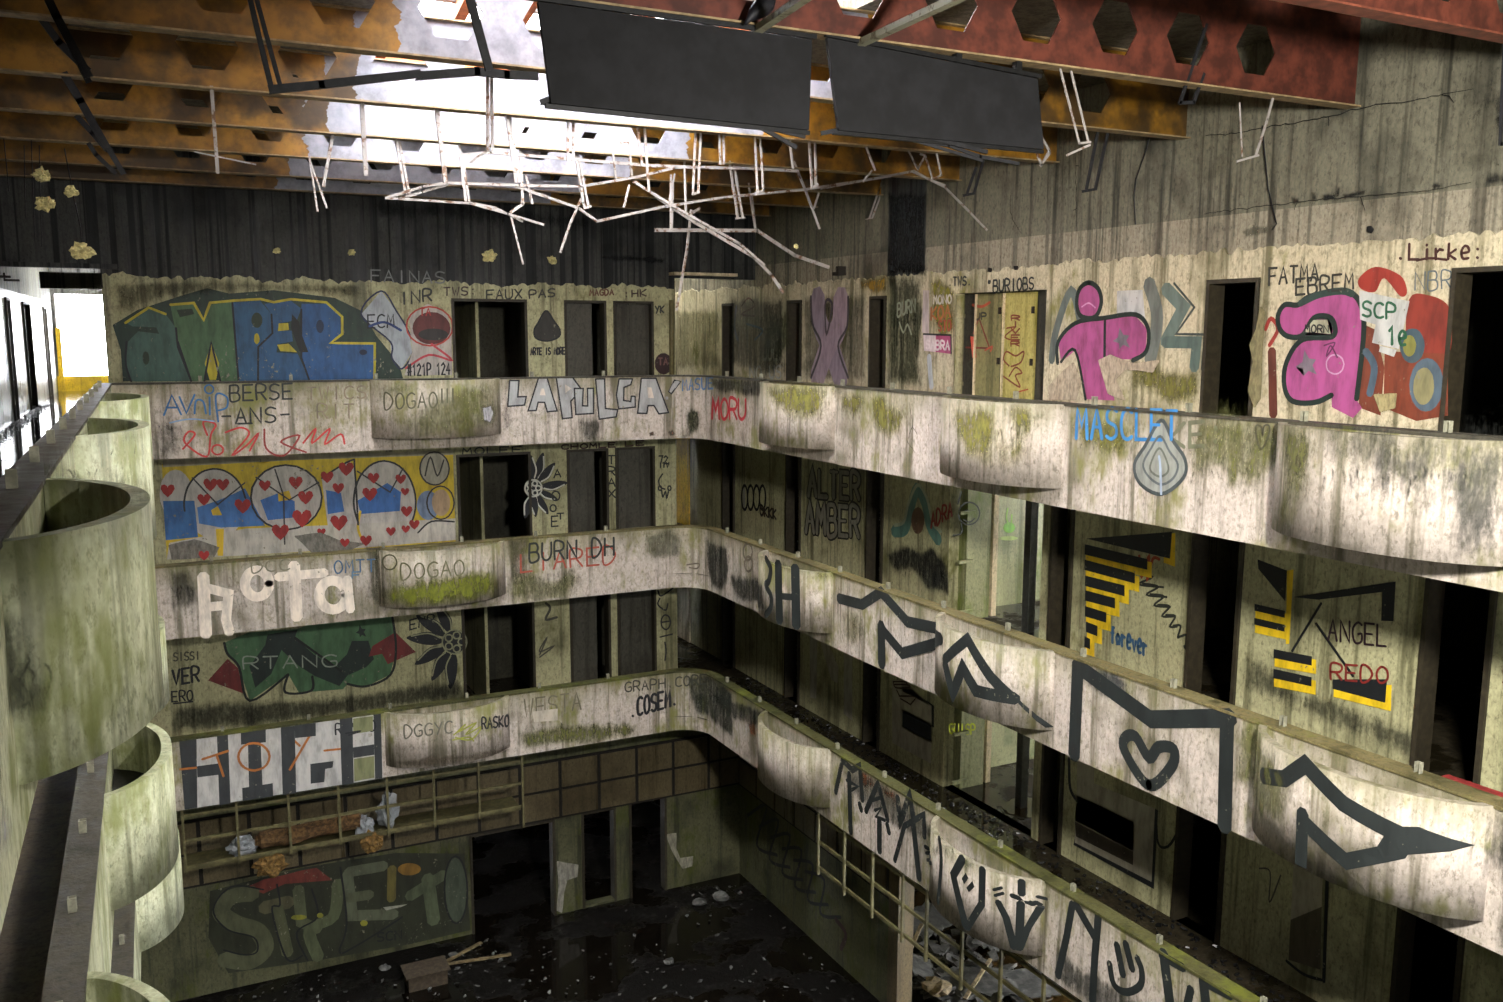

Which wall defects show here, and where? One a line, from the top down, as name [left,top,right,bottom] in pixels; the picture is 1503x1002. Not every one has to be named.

damp [1353,433,1429,485]
damp [1448,454,1498,544]